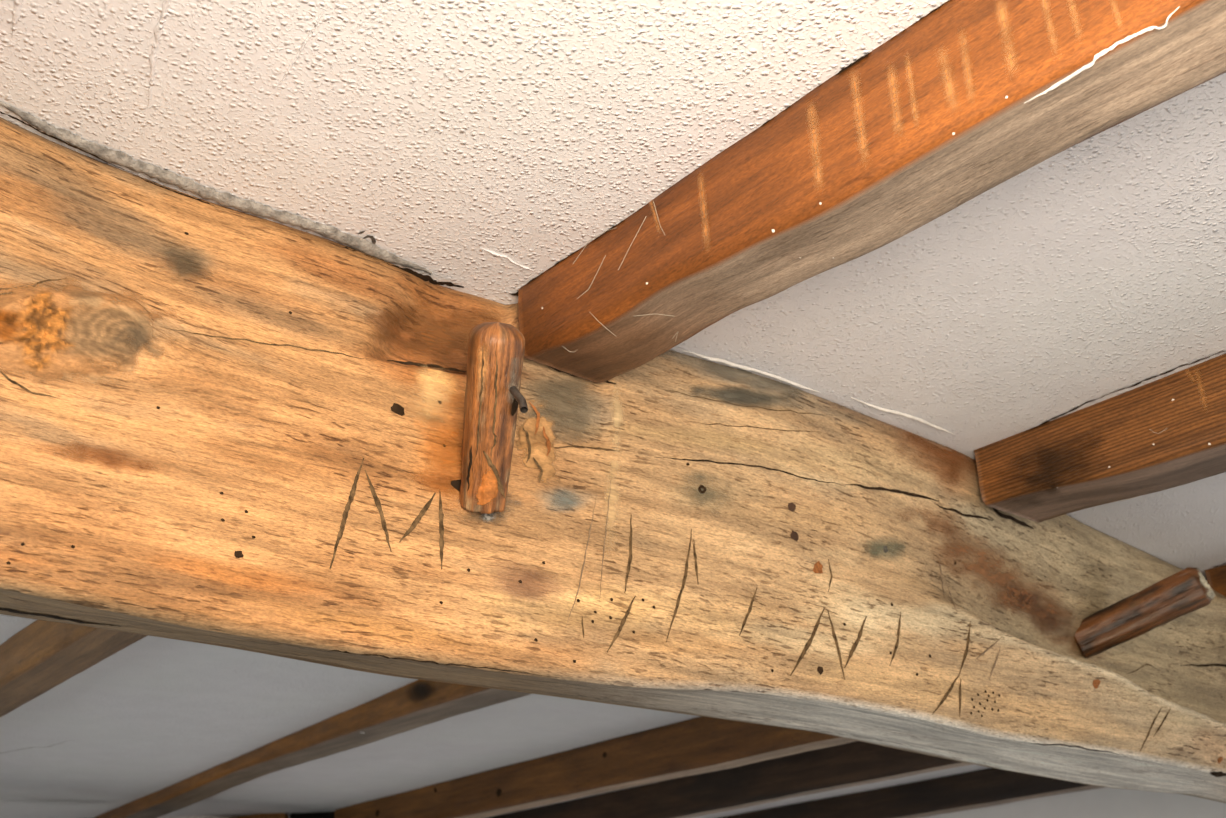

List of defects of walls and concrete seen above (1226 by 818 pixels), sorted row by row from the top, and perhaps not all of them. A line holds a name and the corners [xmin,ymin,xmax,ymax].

crack [664,389,837,432]
crack [555,444,618,452]
crack [657,457,993,521]
crack [1127,664,1226,674]